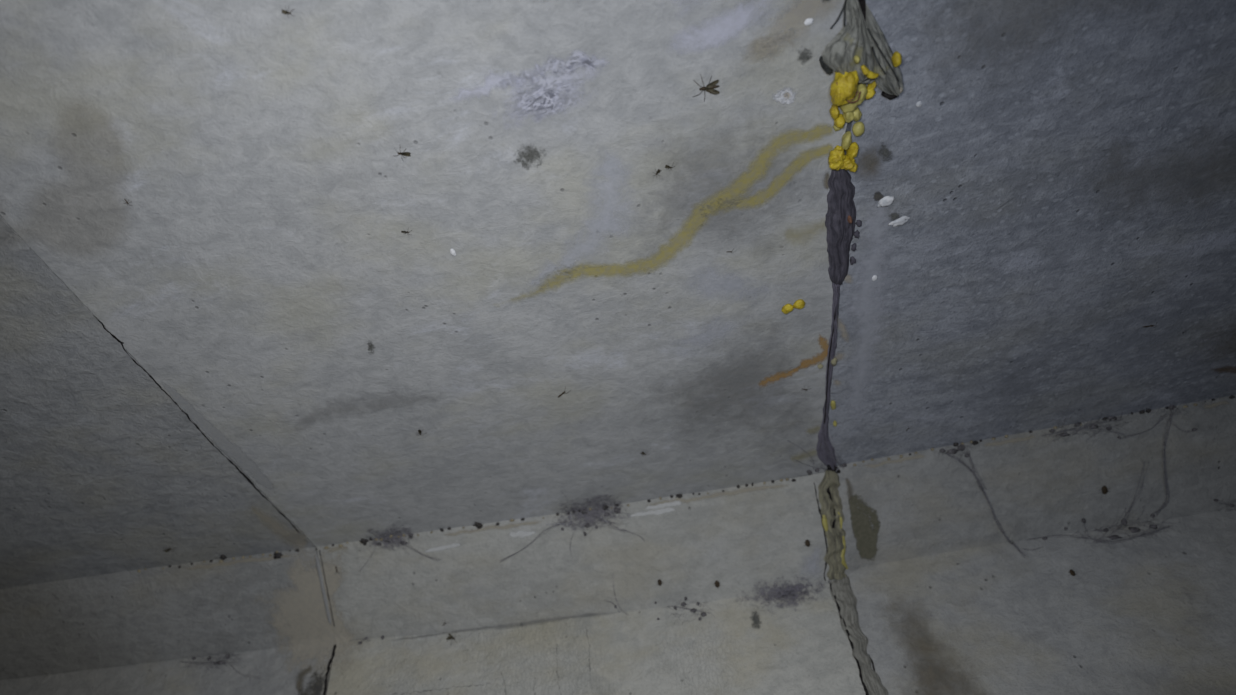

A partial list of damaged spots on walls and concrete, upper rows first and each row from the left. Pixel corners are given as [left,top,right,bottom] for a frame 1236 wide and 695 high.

leakage [540,126,832,291]
crack [93,315,300,533]
crack [323,645,336,695]
crack [814,483,875,695]